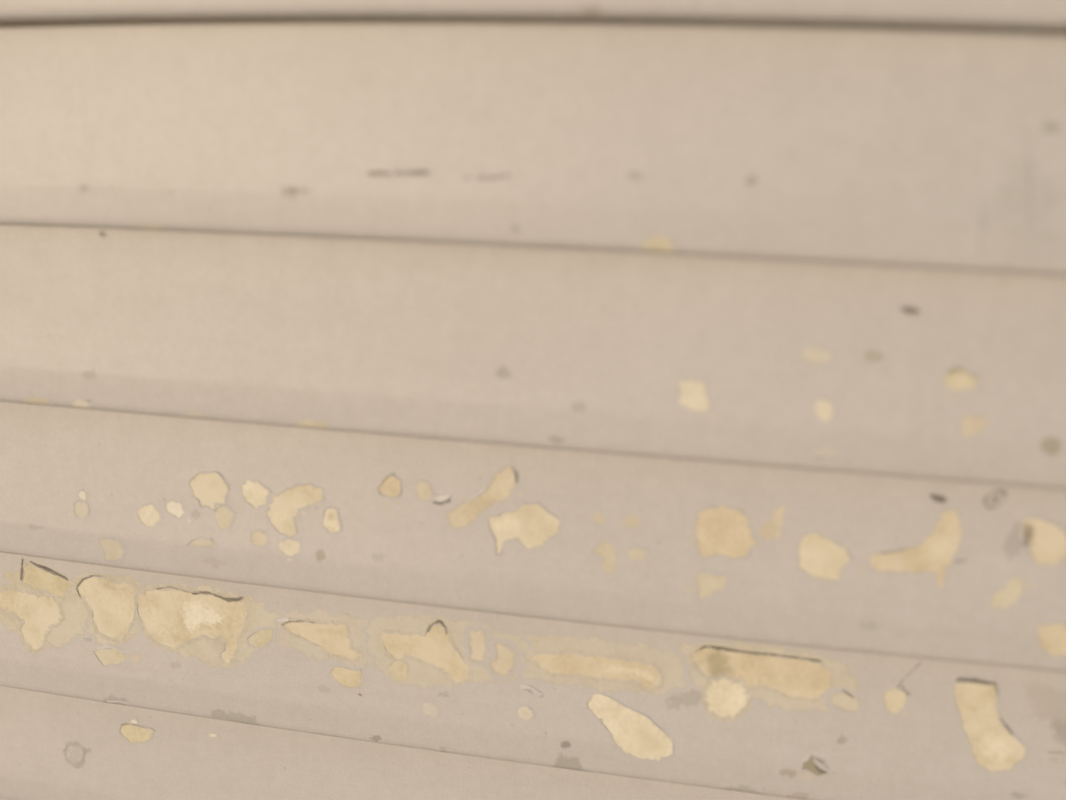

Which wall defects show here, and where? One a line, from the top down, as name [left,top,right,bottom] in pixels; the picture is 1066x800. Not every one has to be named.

peeling [675,377,715,419]
peeling [136,470,343,563]
peeling [486,500,563,557]
peeling [687,503,762,562]
peeling [795,491,966,591]
peeling [999,516,1066,570]
peeling [0,561,286,673]
peeling [673,638,865,722]
peeling [585,691,676,764]
peeling [950,678,1030,775]
peeling [798,753,829,778]